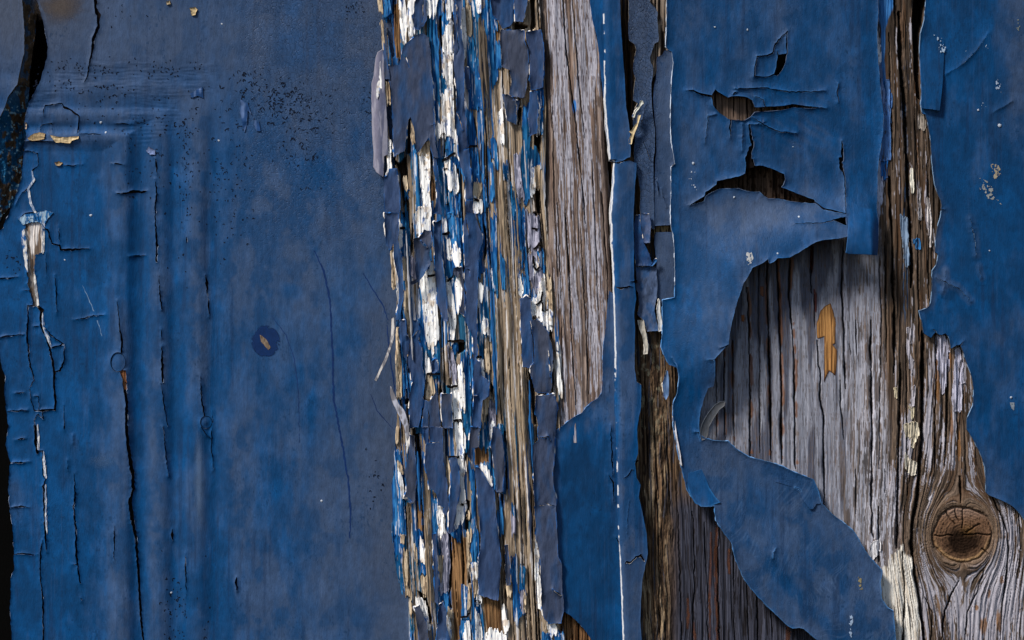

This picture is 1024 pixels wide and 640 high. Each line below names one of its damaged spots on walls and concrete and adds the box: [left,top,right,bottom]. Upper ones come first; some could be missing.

crack [0,0,129,251]
peeling [6,171,53,348]
peeling [37,424,47,532]
crack [0,277,123,640]
crack [113,382,144,640]
peeling [362,0,591,640]
peeling [628,0,897,640]
peeling [904,327,920,476]
peeling [935,334,965,413]